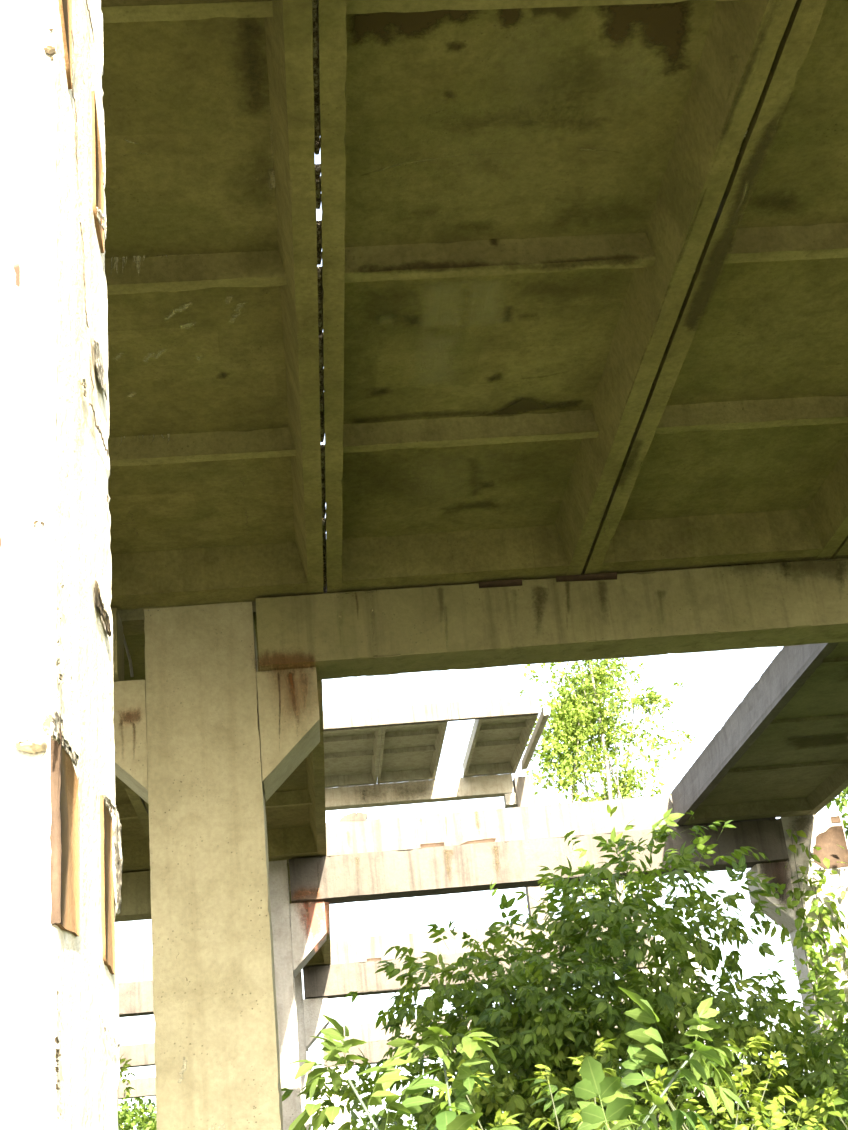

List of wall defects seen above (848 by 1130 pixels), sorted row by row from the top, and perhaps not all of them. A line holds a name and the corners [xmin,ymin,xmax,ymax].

crack [80,222,89,328]
crack [89,356,108,456]
spalling [94,580,111,637]
rust [260,654,314,732]
rust [294,888,326,944]